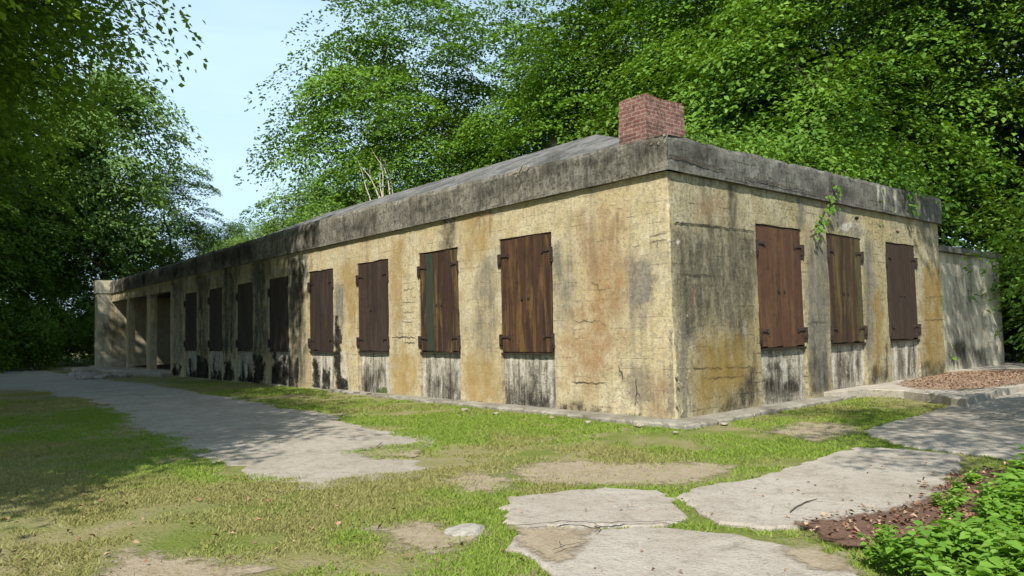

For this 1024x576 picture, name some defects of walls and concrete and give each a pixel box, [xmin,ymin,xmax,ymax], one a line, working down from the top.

leakage [120,227,355,390]
crack [572,368,640,404]
leakage [677,186,754,409]